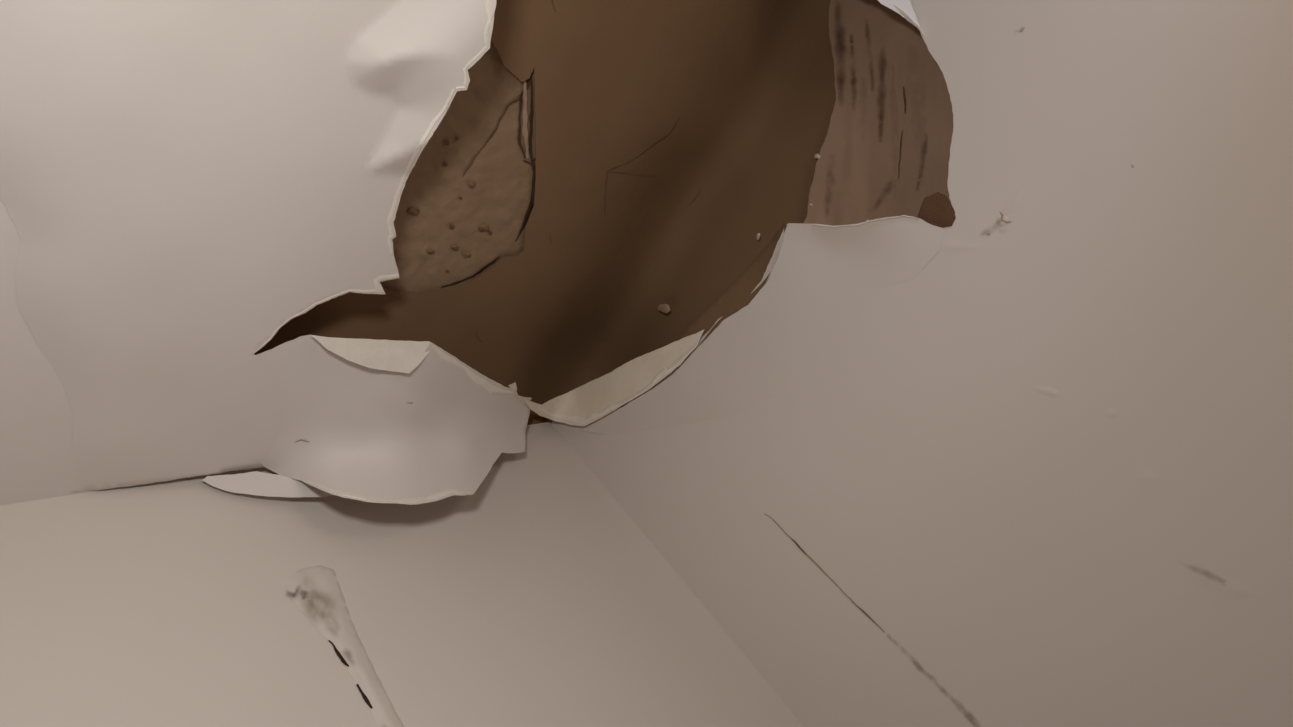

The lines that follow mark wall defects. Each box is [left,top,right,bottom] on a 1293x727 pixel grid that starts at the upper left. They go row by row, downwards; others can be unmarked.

peeling [0,0,956,505]
crack [286,565,405,727]
crack [765,514,885,633]